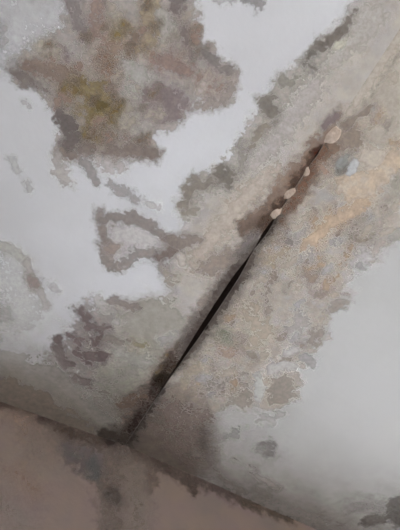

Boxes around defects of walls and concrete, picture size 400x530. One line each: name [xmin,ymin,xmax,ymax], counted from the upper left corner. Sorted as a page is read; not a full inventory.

water stain [240,0,266,11]
water stain [0,0,240,287]
water stain [175,8,359,221]
water stain [0,213,335,530]
crack [138,219,275,425]